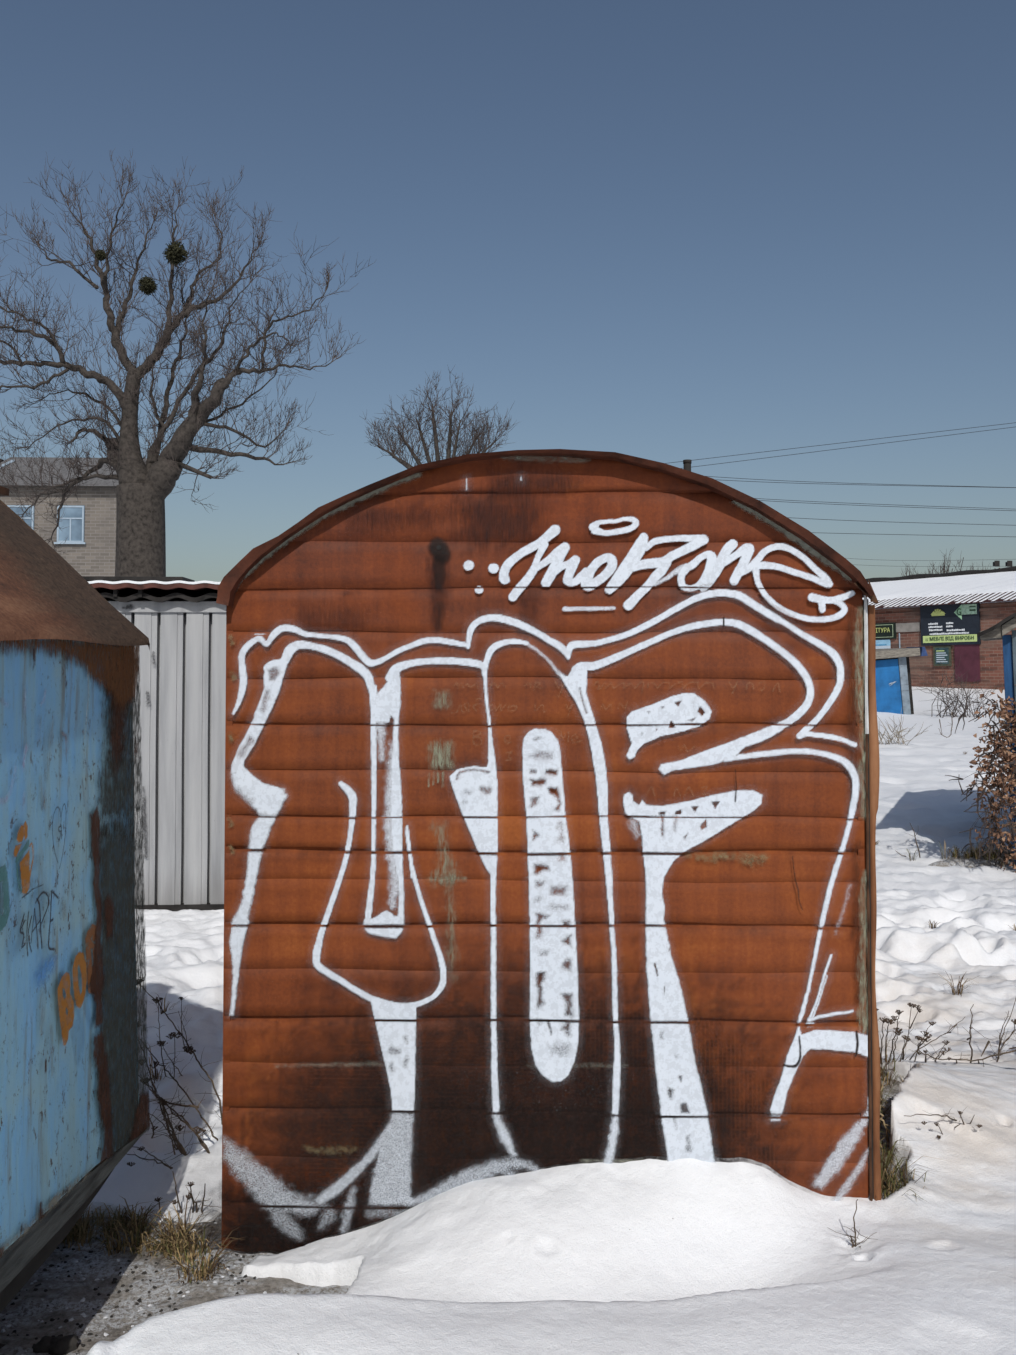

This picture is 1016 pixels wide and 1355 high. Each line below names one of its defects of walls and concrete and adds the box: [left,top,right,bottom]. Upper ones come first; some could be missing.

corrosion [846,607,860,782]